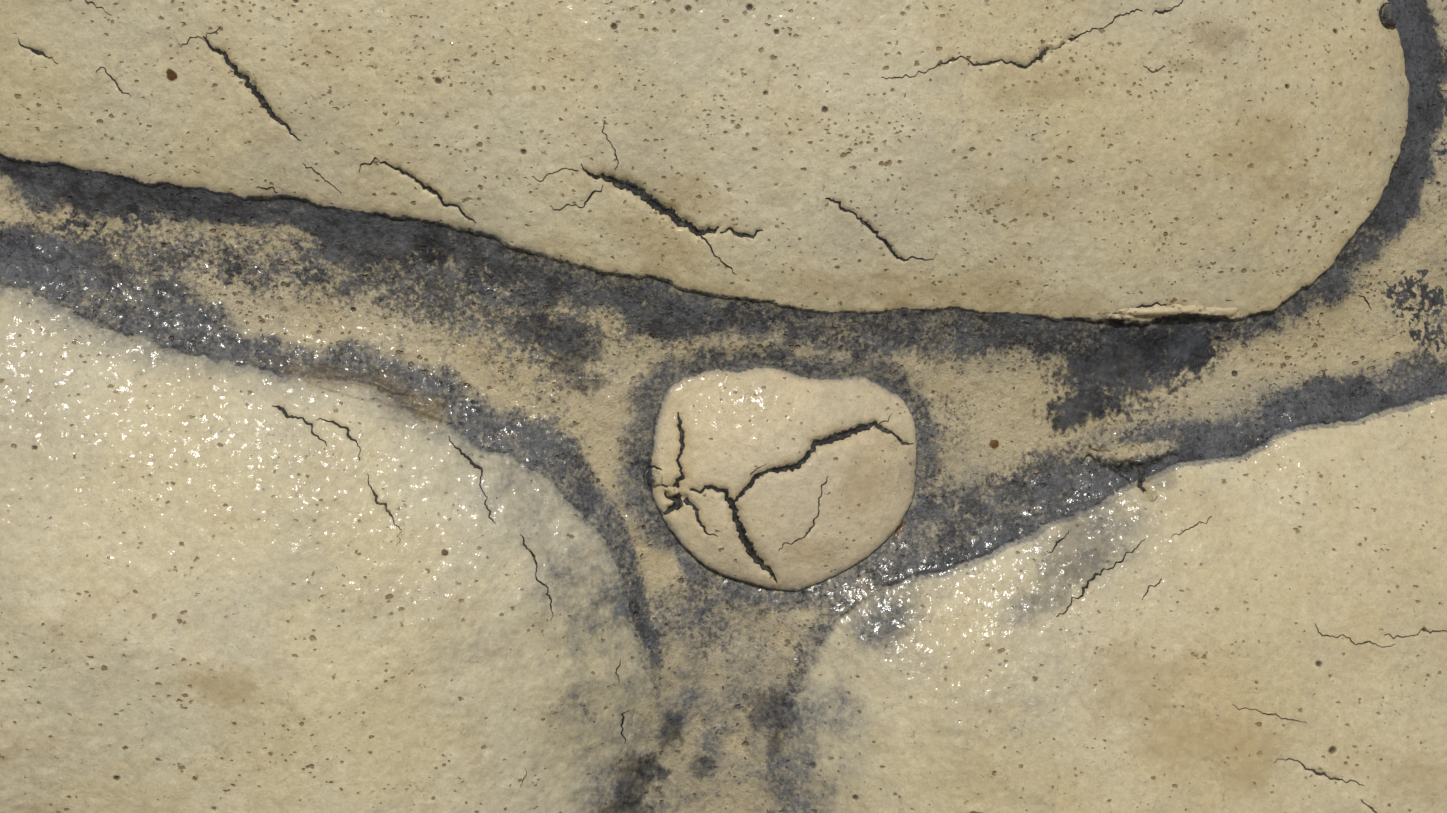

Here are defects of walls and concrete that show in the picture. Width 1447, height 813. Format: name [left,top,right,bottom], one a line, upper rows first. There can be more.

crack [881,0,1183,79]
crack [181,26,476,223]
damp [0,203,161,263]
damp [215,253,249,282]
damp [286,267,330,299]
damp [401,237,446,281]
crack [532,120,763,274]
crack [825,198,936,261]
damp [1360,269,1447,352]
damp [1042,314,1229,434]
crack [272,405,402,544]
crack [662,412,913,583]